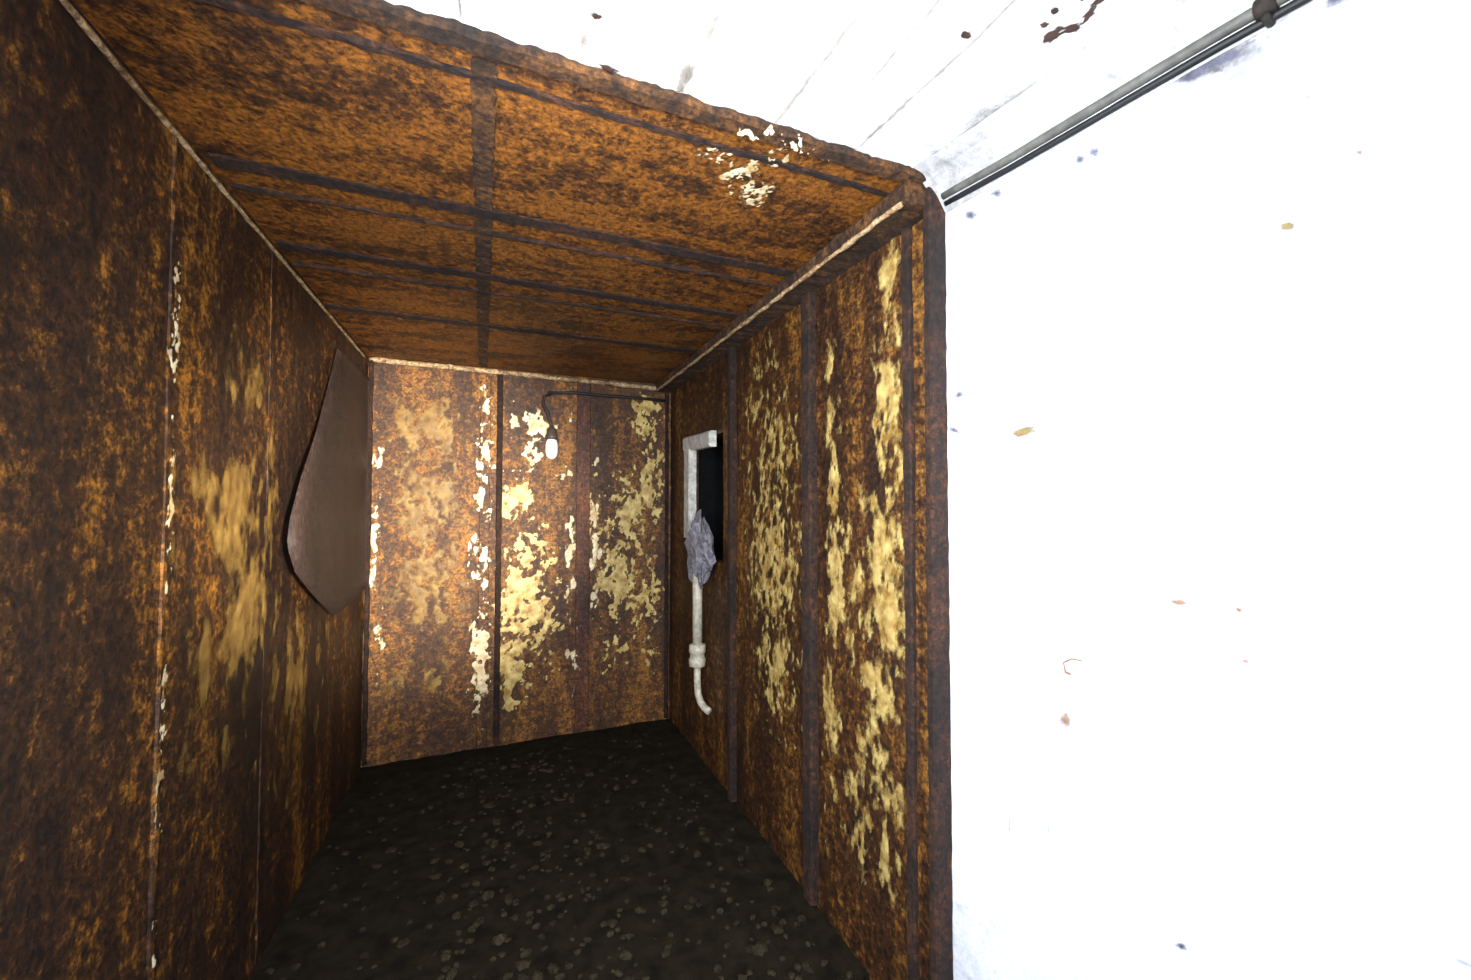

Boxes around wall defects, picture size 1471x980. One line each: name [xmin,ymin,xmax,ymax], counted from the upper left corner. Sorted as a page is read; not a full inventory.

peeling [698,125,814,207]
peeling [369,382,671,717]
peeling [742,338,803,733]
peeling [821,239,905,907]